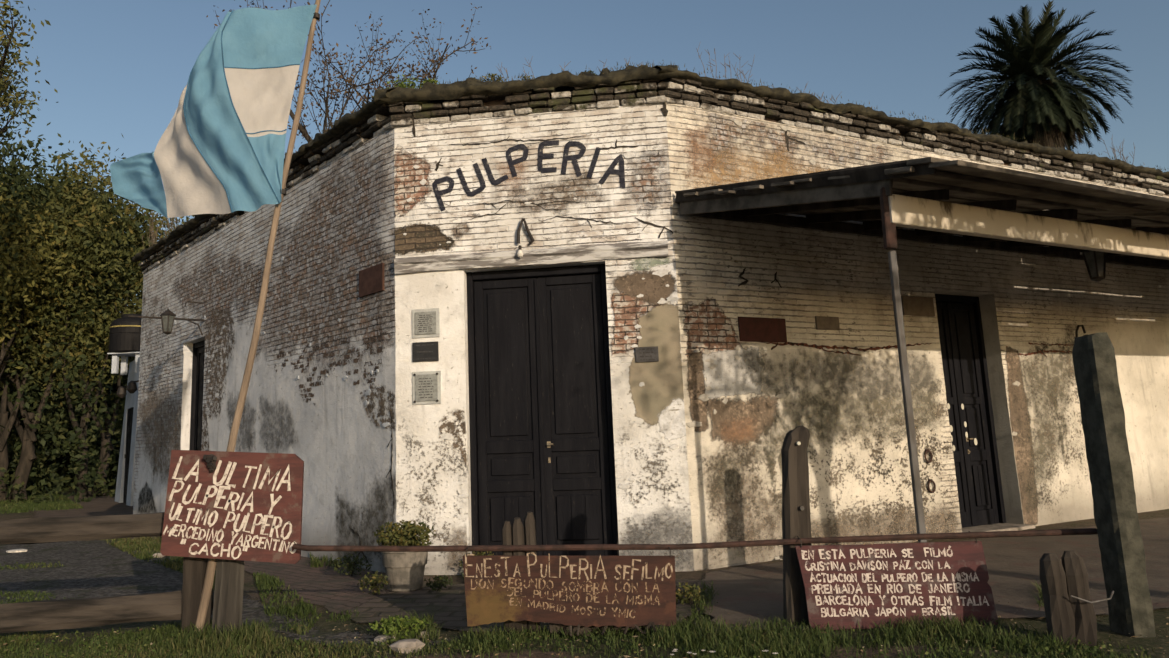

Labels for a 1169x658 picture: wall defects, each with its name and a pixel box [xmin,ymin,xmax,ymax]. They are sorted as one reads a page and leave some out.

flaking render [694,113,894,170]
damp [138,390,182,513]
flaking render [175,135,470,563]
peeling [611,262,931,565]
damp [705,350,954,555]
damp [1022,340,1084,507]